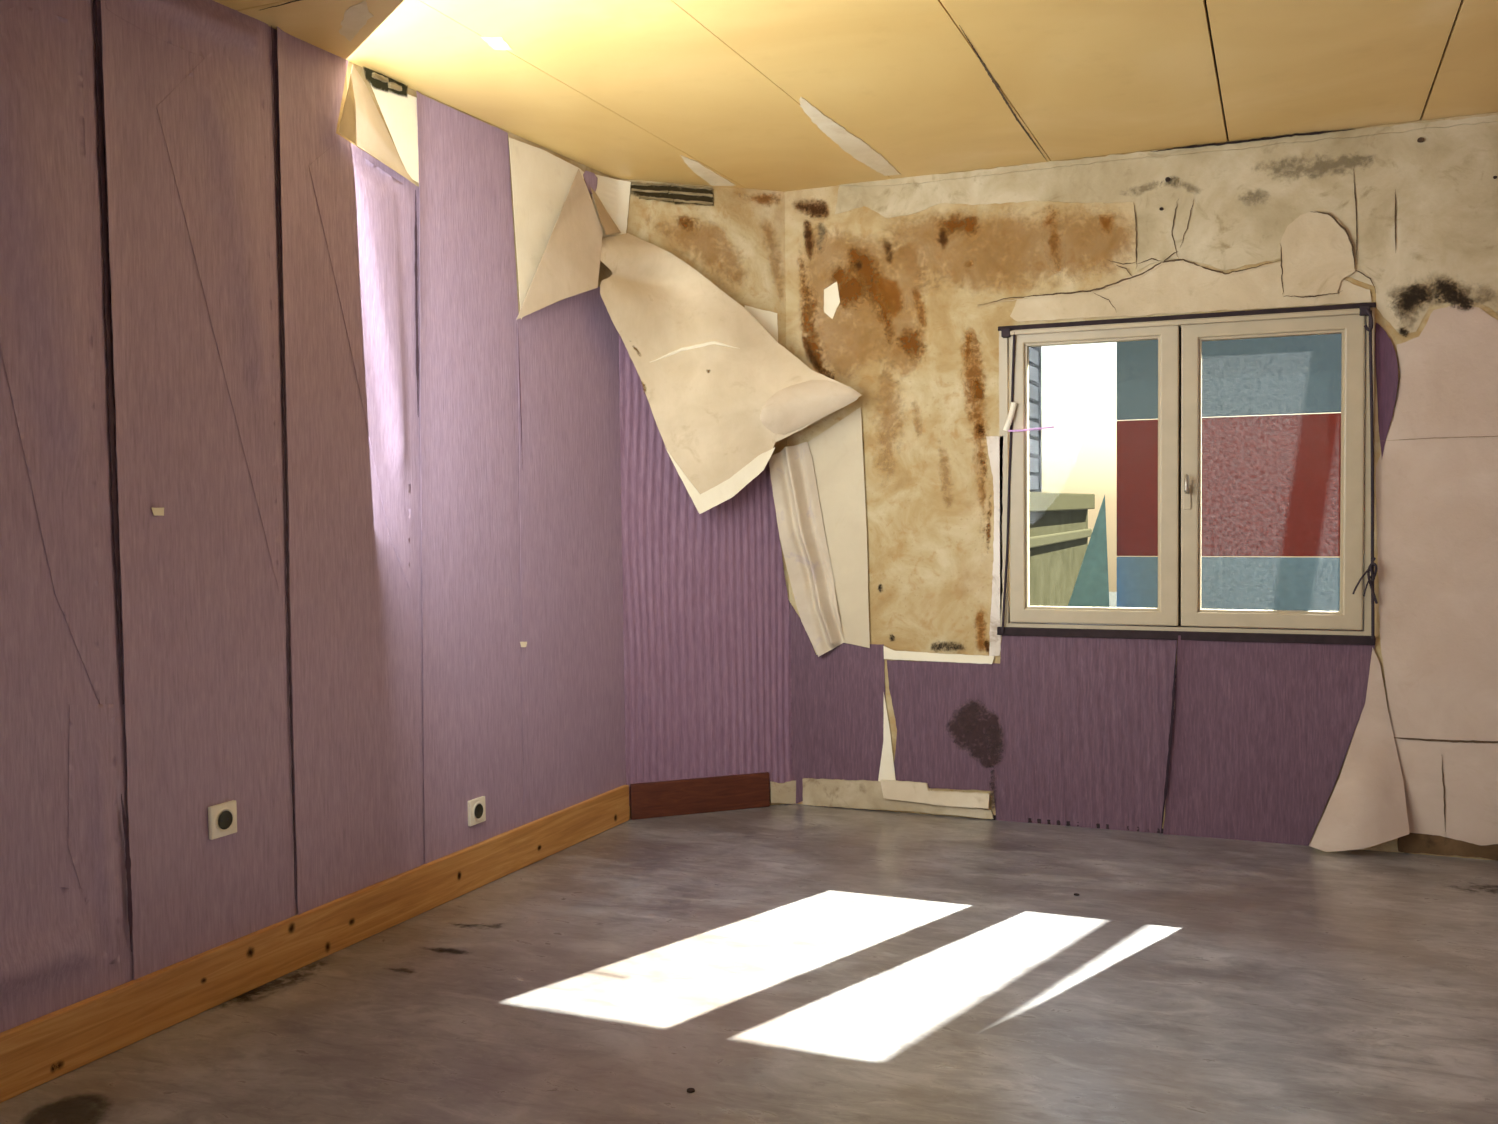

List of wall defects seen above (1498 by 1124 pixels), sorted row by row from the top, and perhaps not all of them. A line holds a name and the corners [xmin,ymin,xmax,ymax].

flaking render [363,67,408,97]
flaking render [630,182,714,206]
water stain [796,200,834,380]
water stain [830,242,926,359]
peeling [835,115,1498,335]
crack [981,169,1376,310]
crack [1151,129,1353,152]
crack [1391,189,1399,248]
water stain [1393,280,1490,337]
peeling [986,436,1003,656]
water stain [931,642,963,651]
water stain [947,701,1003,808]